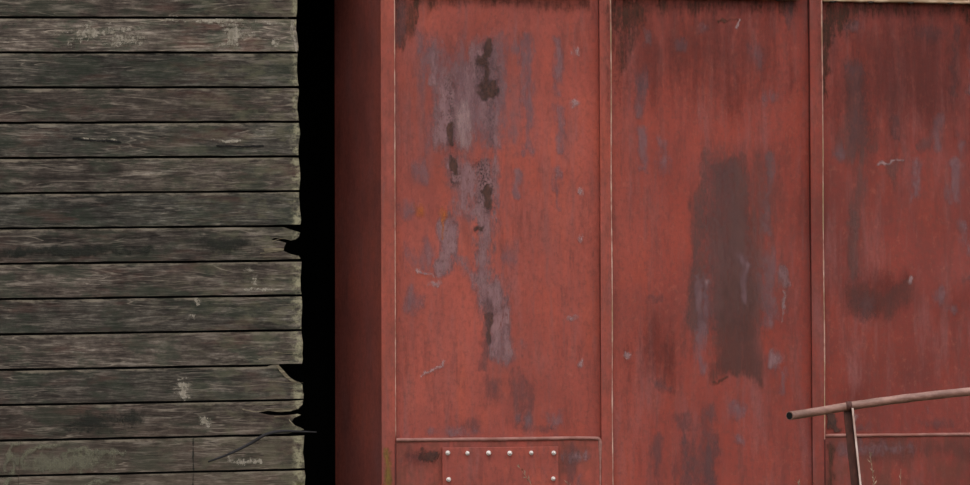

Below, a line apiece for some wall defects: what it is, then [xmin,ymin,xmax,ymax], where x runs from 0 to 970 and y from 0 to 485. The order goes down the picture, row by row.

peeling [416,43,513,365]